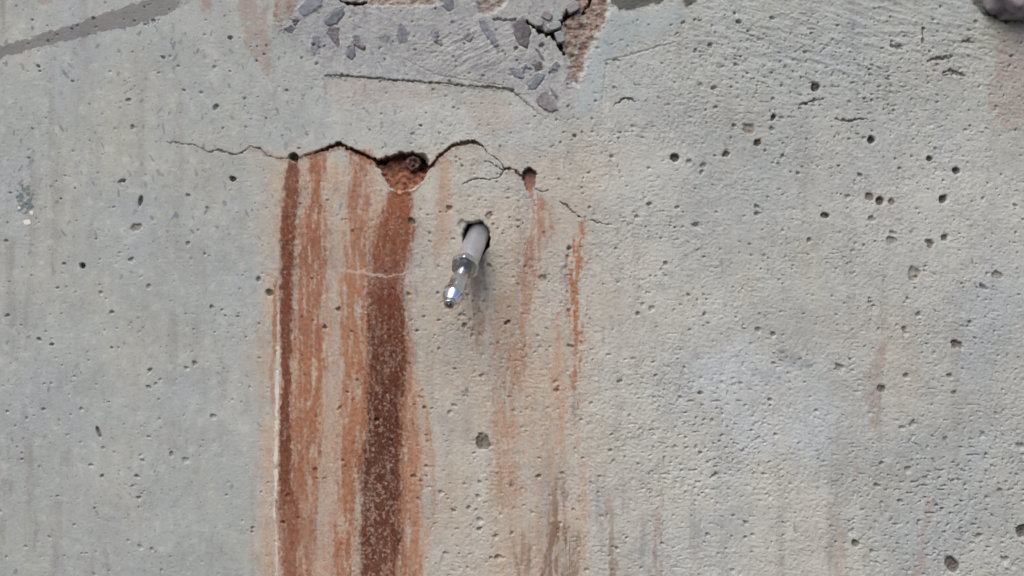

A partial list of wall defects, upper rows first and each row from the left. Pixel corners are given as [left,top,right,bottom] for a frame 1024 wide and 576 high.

spalling [273,0,454,60]
spalling [475,0,503,47]
spalling [510,0,607,112]
crack [307,142,387,166]
spalling [377,153,429,193]
crack [426,140,612,225]
spalling [523,168,537,193]
rust [568,221,585,406]
rust [272,150,422,576]